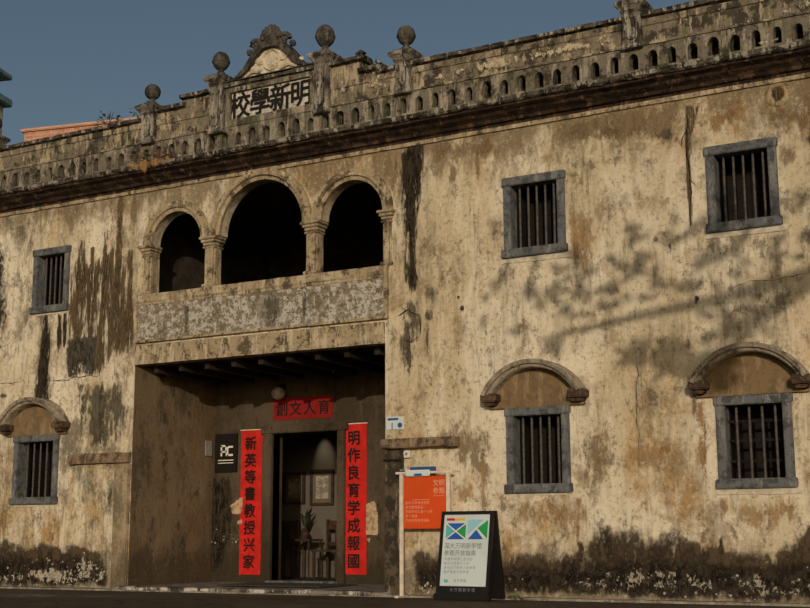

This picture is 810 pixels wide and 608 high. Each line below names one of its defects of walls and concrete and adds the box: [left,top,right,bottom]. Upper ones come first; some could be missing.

water stain [435,142,466,183]
water stain [394,145,432,373]
water stain [570,214,591,266]
water stain [34,194,136,400]
water stain [78,383,127,448]
water stain [579,436,614,495]
water stain [0,516,112,597]
water stain [412,551,438,590]
water stain [503,525,810,601]